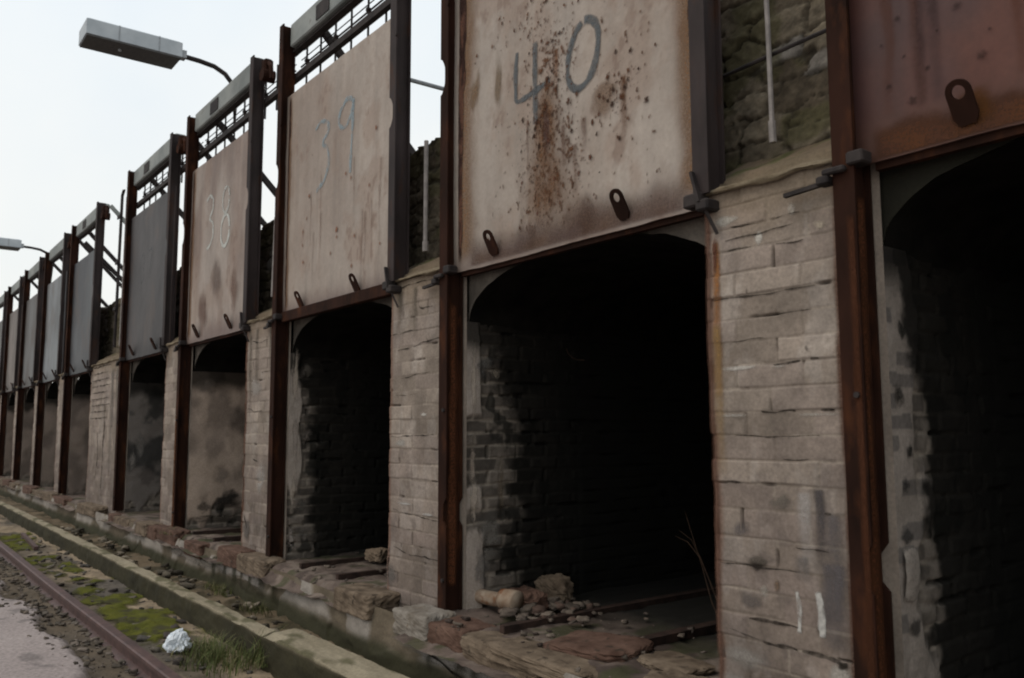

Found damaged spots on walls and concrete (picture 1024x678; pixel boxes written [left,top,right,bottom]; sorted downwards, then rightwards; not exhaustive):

rust [458,0,679,264]
rust [876,91,1024,158]
crack [714,285,814,342]
crack [774,357,818,365]
crack [736,408,835,461]
rust [833,208,875,678]
peeling [470,449,500,587]
crack [722,547,829,573]
crack [733,617,840,664]